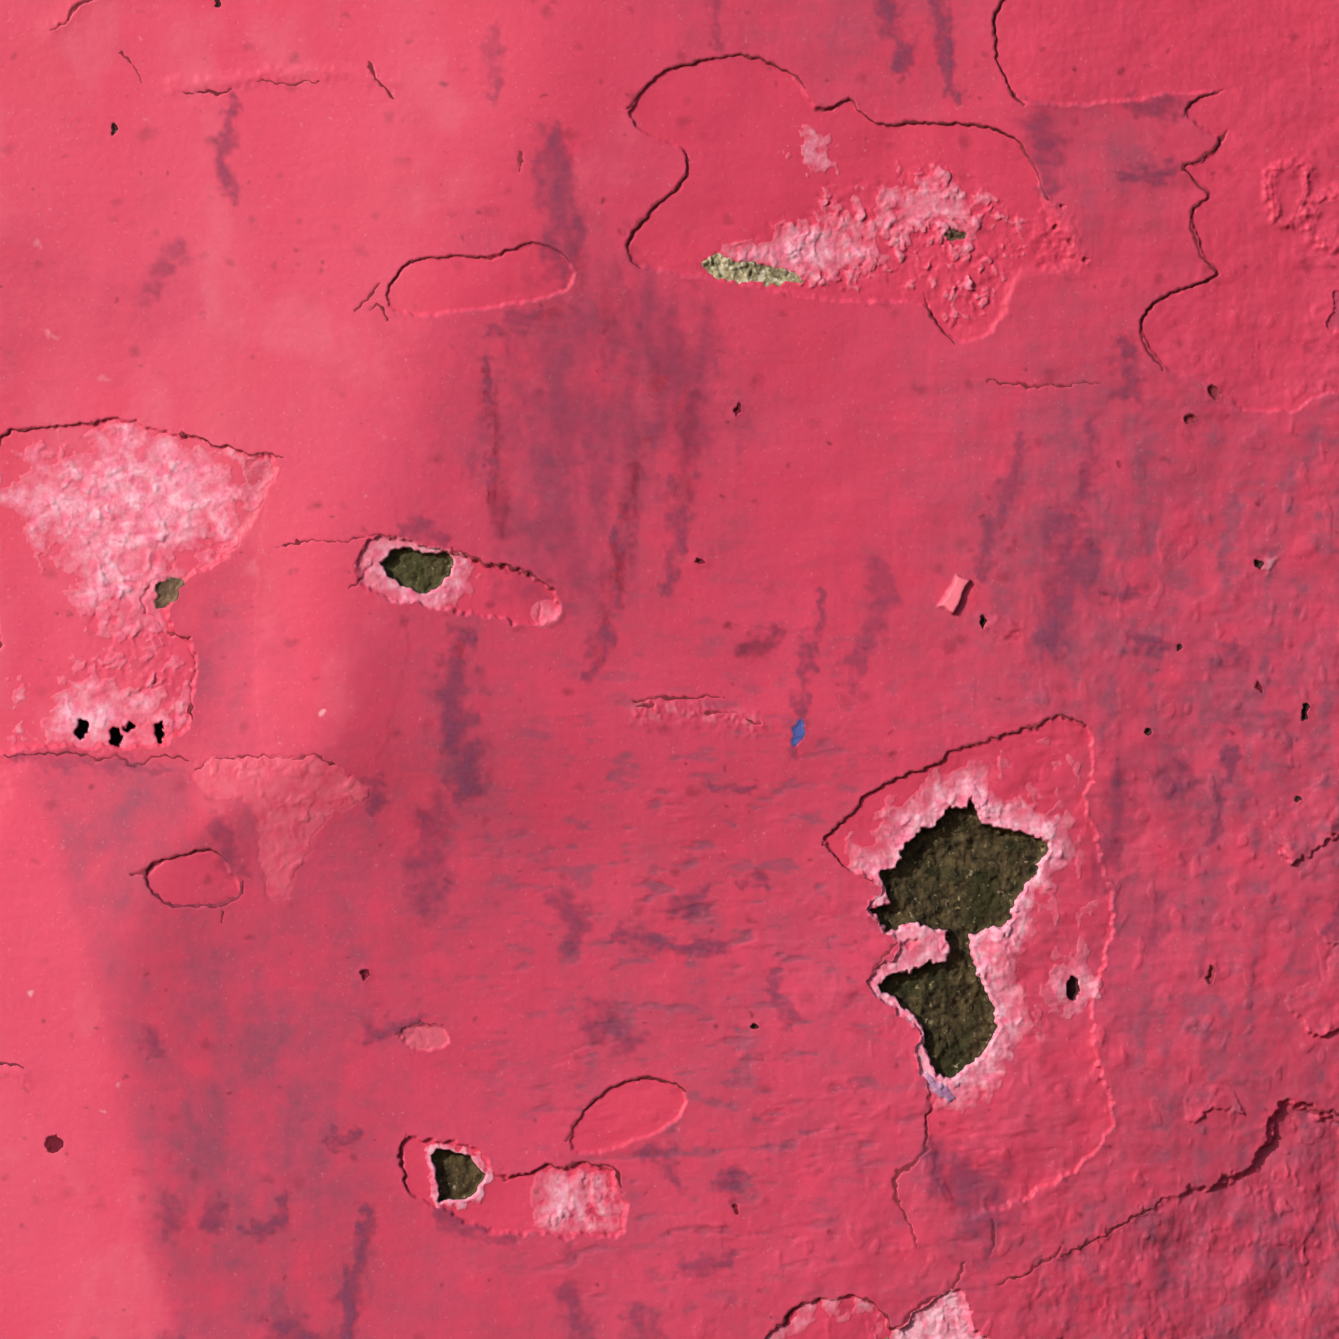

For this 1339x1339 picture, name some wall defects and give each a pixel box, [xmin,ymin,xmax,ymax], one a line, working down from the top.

crack [50,0,93,31]
peeling [625,53,1072,345]
crack [986,378,1100,389]
spalling [282,533,566,629]
peeling [0,417,370,900]
spalling [822,714,1115,1214]
spalling [397,1075,687,1241]
peeling [765,1288,989,1339]
crack [892,1111,931,1248]
crack [894,1219,1062,1328]
spalling [1027,1102,1339,1339]